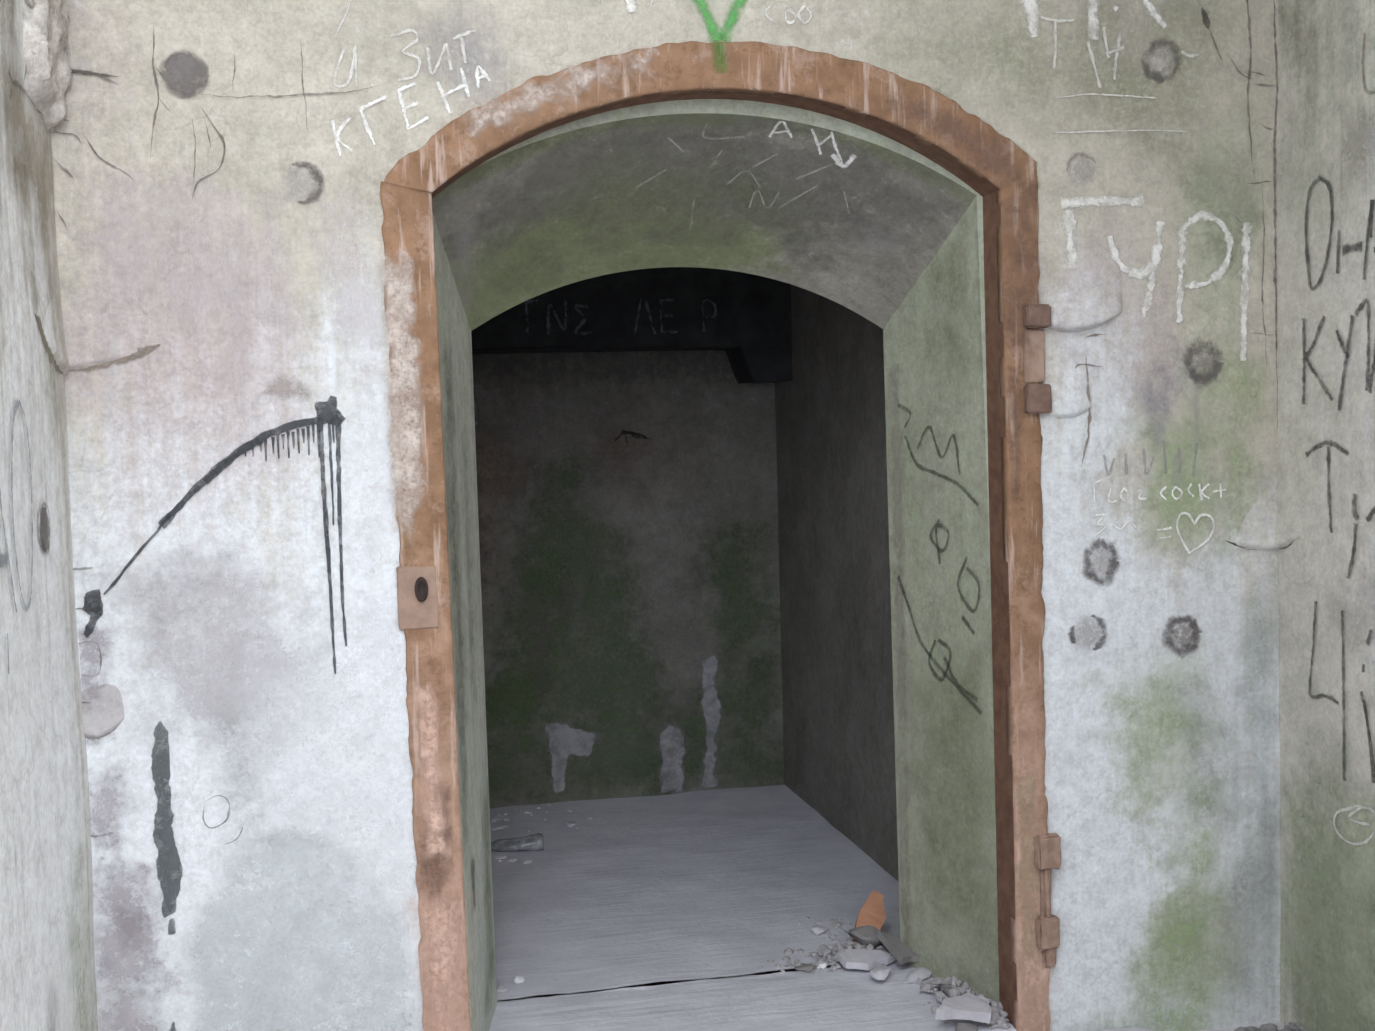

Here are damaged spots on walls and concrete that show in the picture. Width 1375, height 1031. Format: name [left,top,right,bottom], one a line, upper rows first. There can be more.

spalling [22,0,73,135]
corrosion [417,688,465,1031]